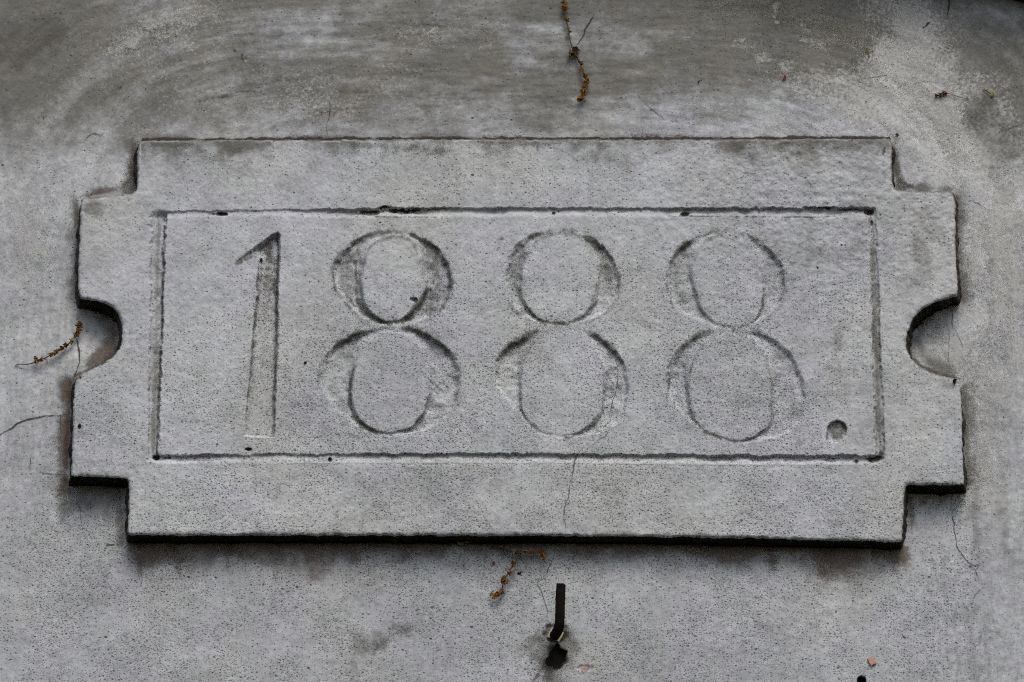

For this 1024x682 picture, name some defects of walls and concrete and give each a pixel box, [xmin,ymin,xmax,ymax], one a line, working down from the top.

crack [0,414,65,435]
crack [537,355,618,622]
crack [951,508,980,597]